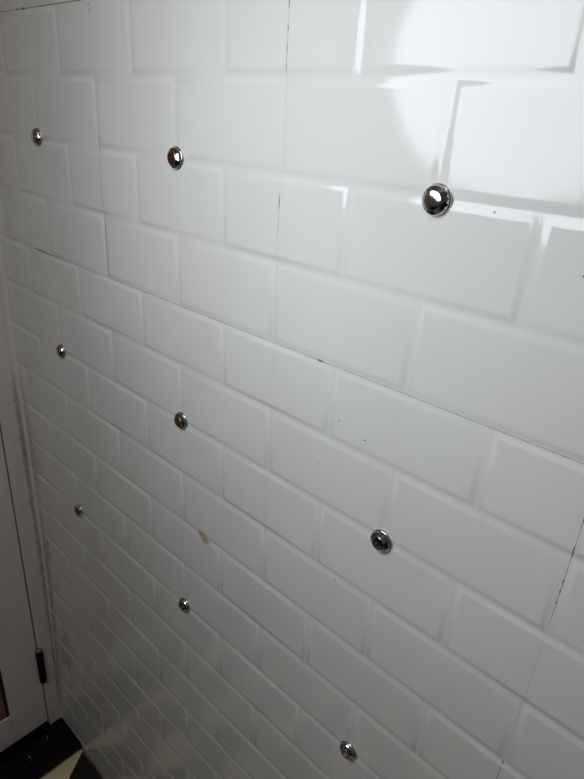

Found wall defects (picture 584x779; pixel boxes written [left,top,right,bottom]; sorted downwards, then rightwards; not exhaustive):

crack [34,115,583,464]
crack [547,519,584,629]